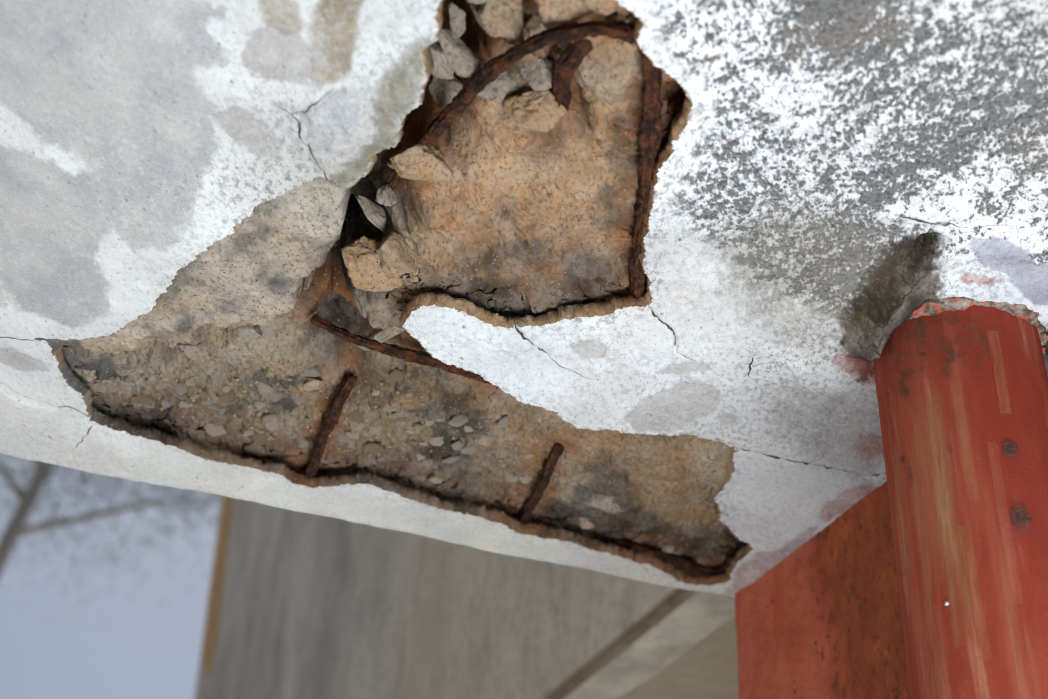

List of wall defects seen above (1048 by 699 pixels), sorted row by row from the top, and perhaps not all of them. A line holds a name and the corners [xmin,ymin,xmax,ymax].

water stain [245,0,361,84]
water stain [0,0,277,327]
crack [275,89,335,182]
water stain [333,41,430,185]
peeling [655,0,1048,320]
spalling [35,0,753,586]
crack [514,319,588,379]
water stain [840,232,943,382]
crack [734,447,846,472]
peeling [1003,440,1018,458]
peeling [1011,503,1033,530]